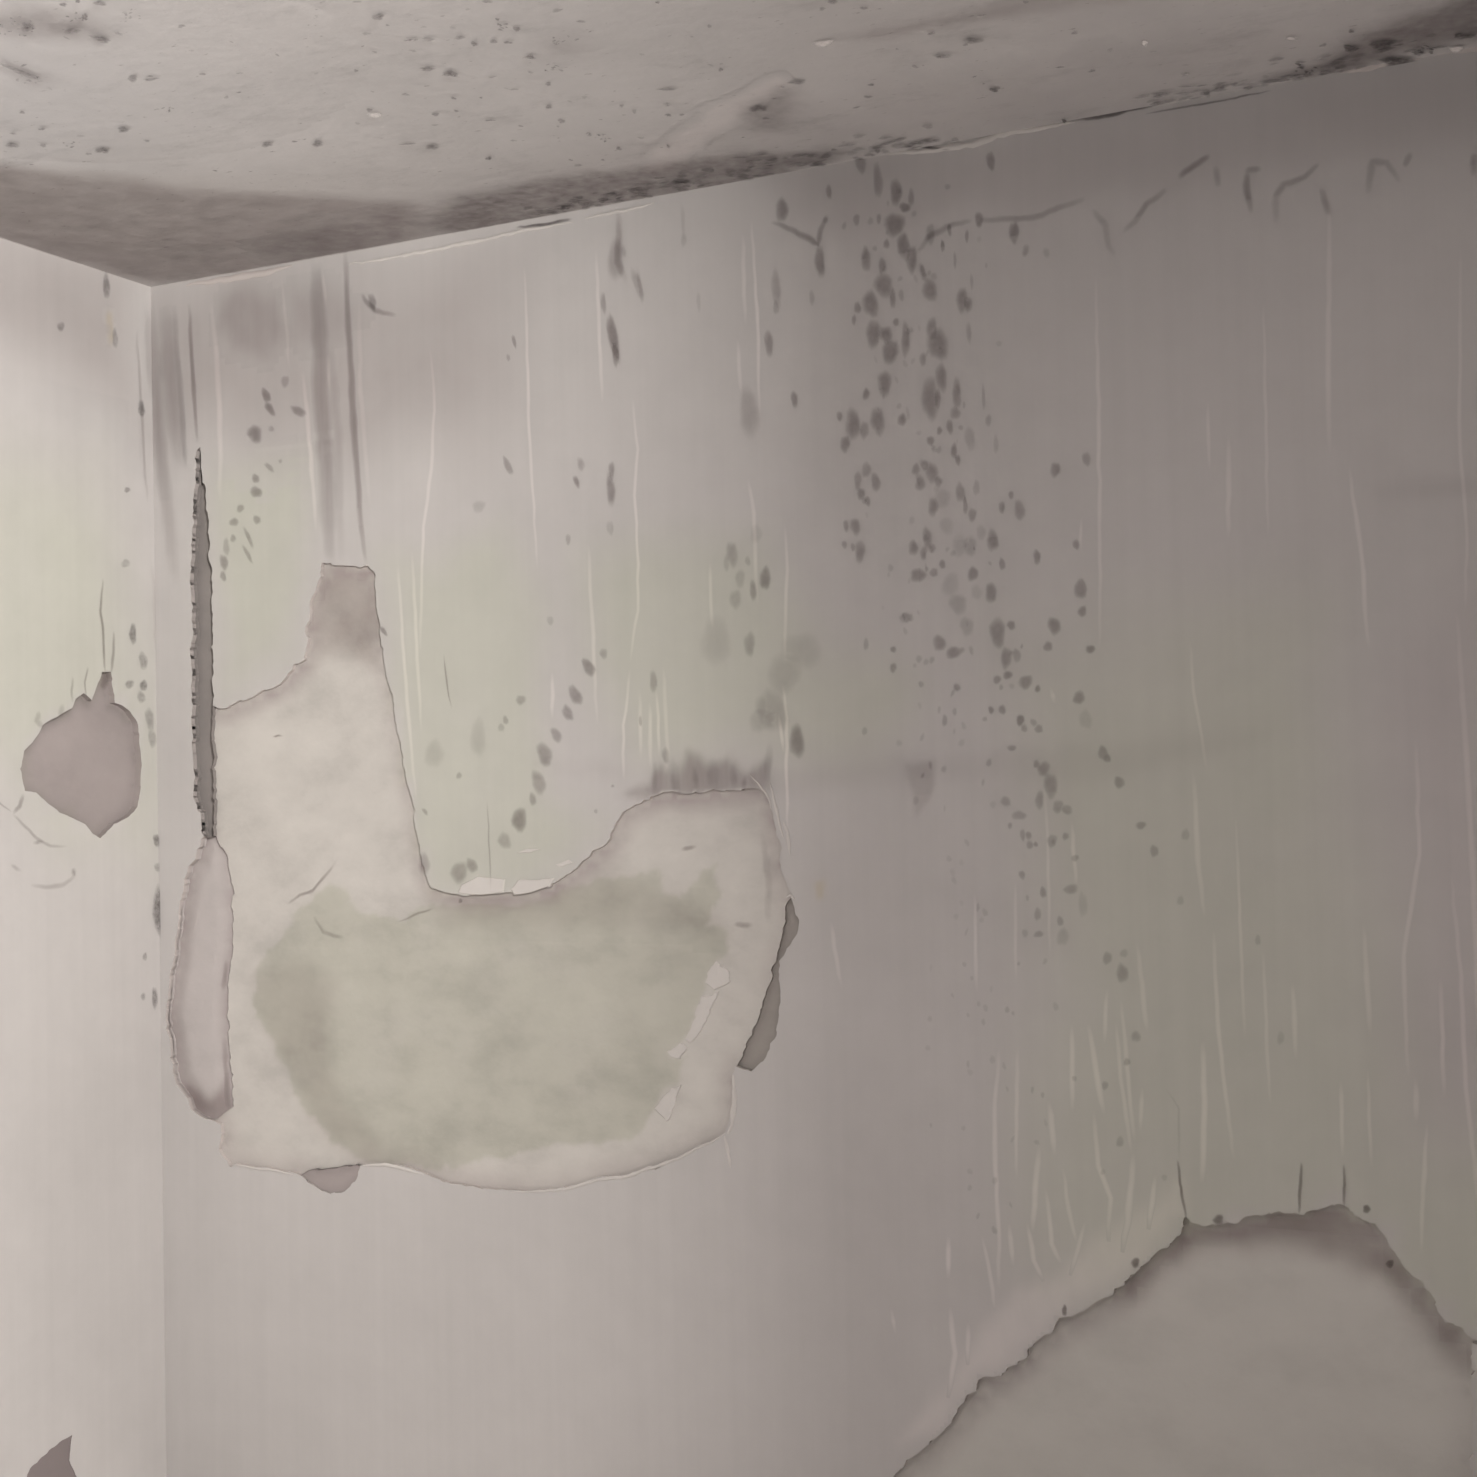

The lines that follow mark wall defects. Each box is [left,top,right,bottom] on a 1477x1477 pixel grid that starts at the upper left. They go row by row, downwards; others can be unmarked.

flaking render [20,672,142,838]
crack [190,448,218,838]
flaking render [166,448,799,1194]
damp [621,397,671,782]
damp [777,682,790,830]
peeling [27,1435,77,1477]
flaking render [894,1203,1477,1477]